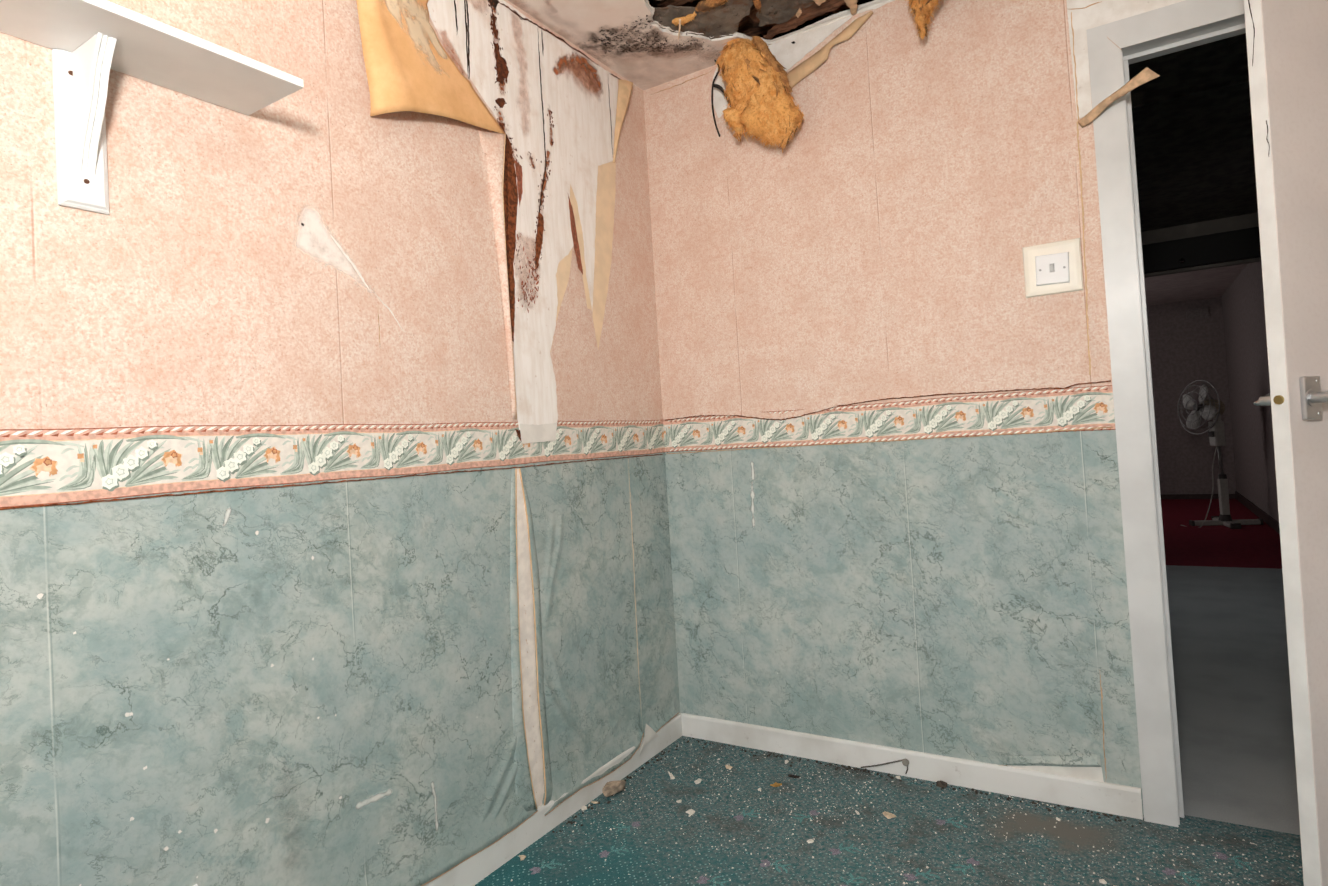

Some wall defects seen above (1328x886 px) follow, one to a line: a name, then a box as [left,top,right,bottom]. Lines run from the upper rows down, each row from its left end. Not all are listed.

leakage [553,15,711,90]
flaking render [713,67,728,118]
flaking render [768,0,895,88]
peeling [356,0,633,444]
flaking render [1066,0,1185,375]